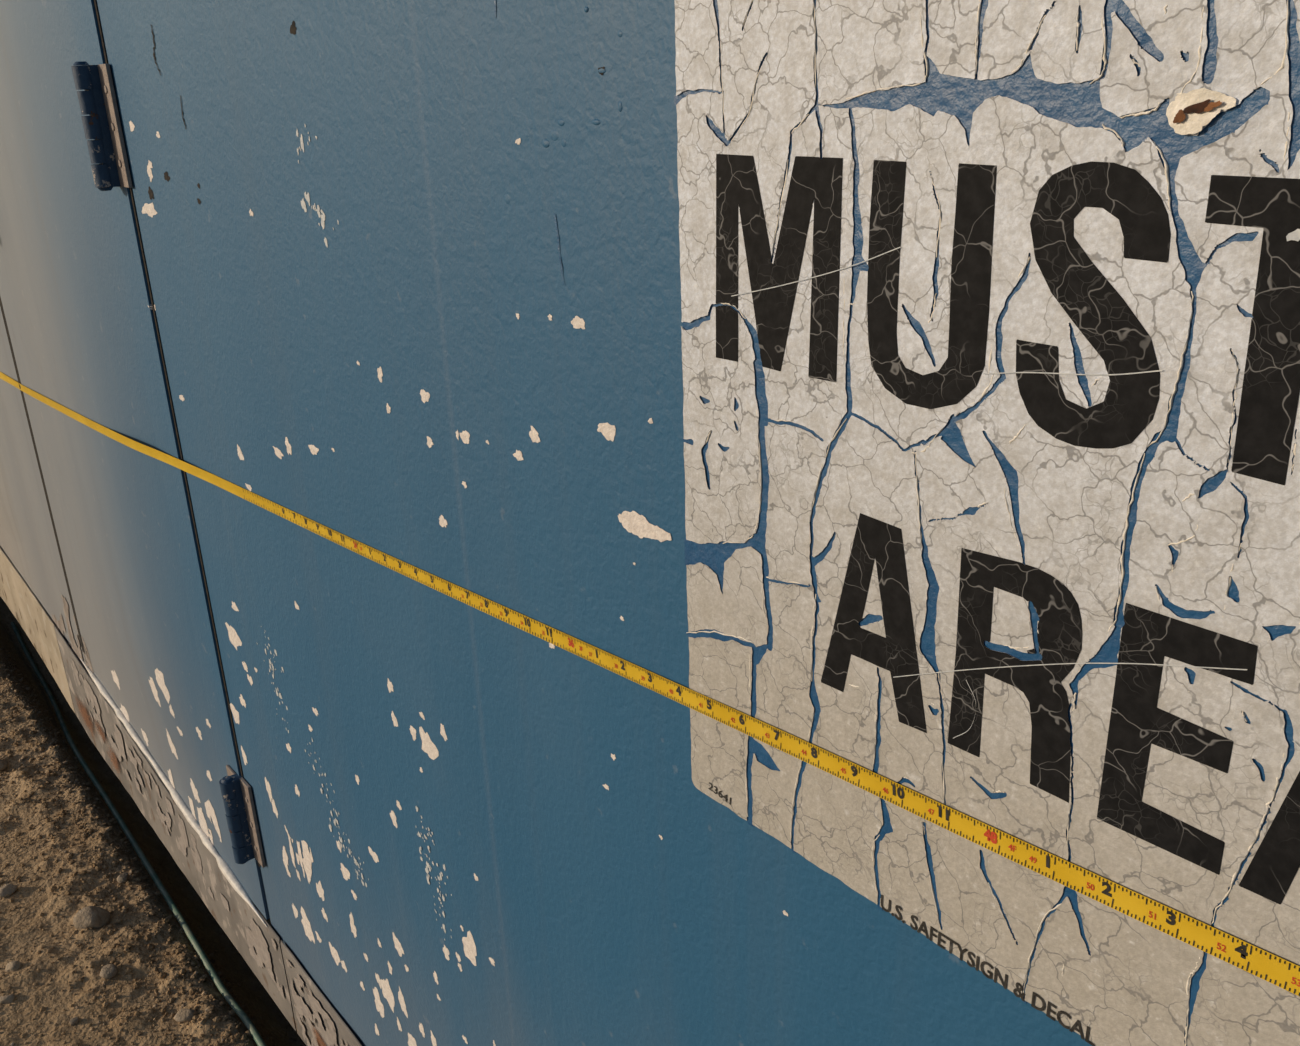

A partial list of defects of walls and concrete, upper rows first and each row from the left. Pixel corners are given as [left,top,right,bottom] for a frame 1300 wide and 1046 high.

rust [1166,88,1236,135]
peeling [597,423,616,441]
peeling [618,511,672,542]
crack [674,0,1300,1046]
peeling [225,602,257,724]
peeling [50,595,229,911]
peeling [391,711,447,773]
peeling [265,777,347,973]
peeling [336,841,357,938]
peeling [245,918,347,1046]
peeling [360,932,437,1046]
peeling [443,925,495,972]